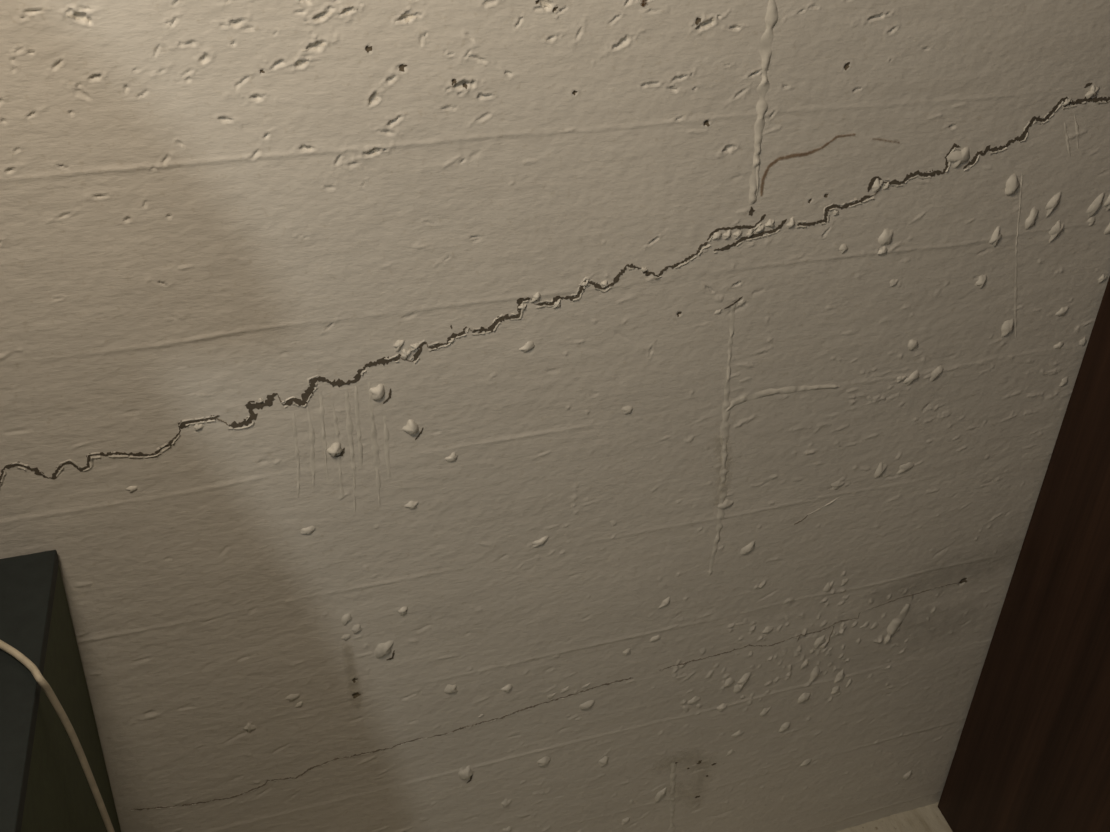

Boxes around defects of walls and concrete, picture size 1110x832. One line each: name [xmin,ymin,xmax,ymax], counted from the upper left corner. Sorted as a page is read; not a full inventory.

crack [0,83,1110,489]
crack [659,581,961,671]
crack [130,677,631,811]